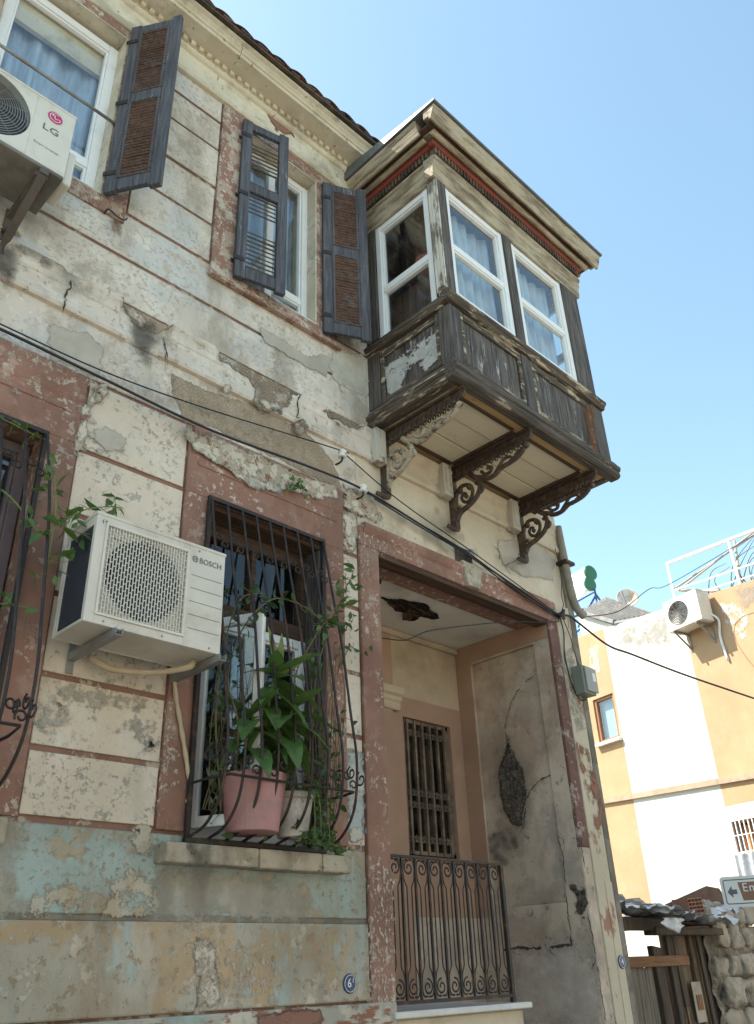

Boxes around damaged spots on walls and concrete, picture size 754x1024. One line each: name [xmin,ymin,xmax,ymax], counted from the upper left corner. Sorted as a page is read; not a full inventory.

crack [63,280,75,310]
flaking render [2,324,127,457]
water stain [134,324,154,350]
flaking render [260,327,369,397]
peeling [385,333,438,394]
flaking render [171,374,392,584]
flaking render [498,538,555,580]
peeling [563,646,602,837]
crack [519,775,551,832]
peeling [347,748,396,1003]
crack [504,833,607,1024]
flaking render [570,884,588,919]